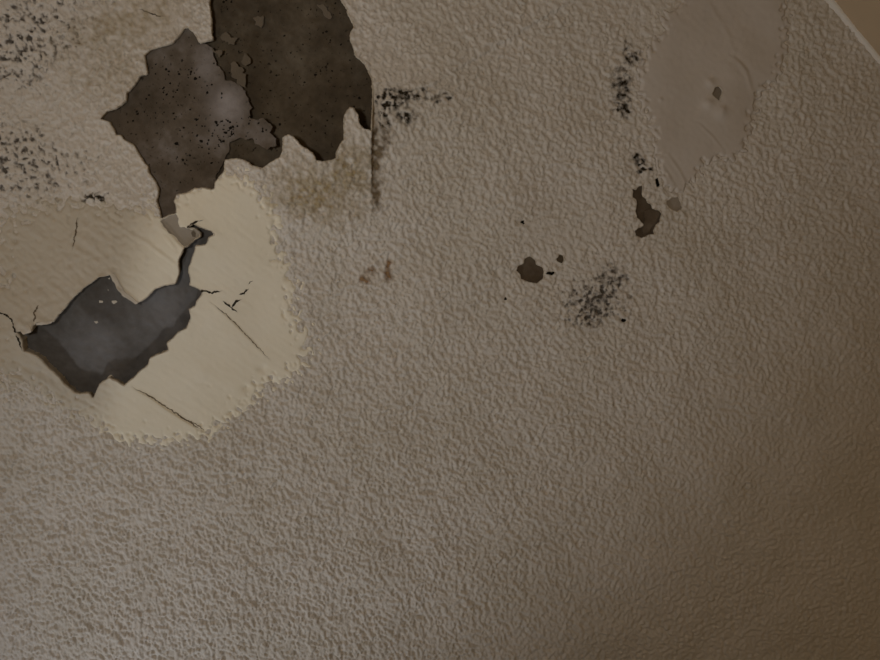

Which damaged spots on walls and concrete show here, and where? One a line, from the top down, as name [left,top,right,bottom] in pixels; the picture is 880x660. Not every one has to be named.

peeling [16,0,374,399]
peeling [632,184,682,238]
peeling [516,254,565,284]
crack [201,281,267,357]
crack [134,388,204,430]